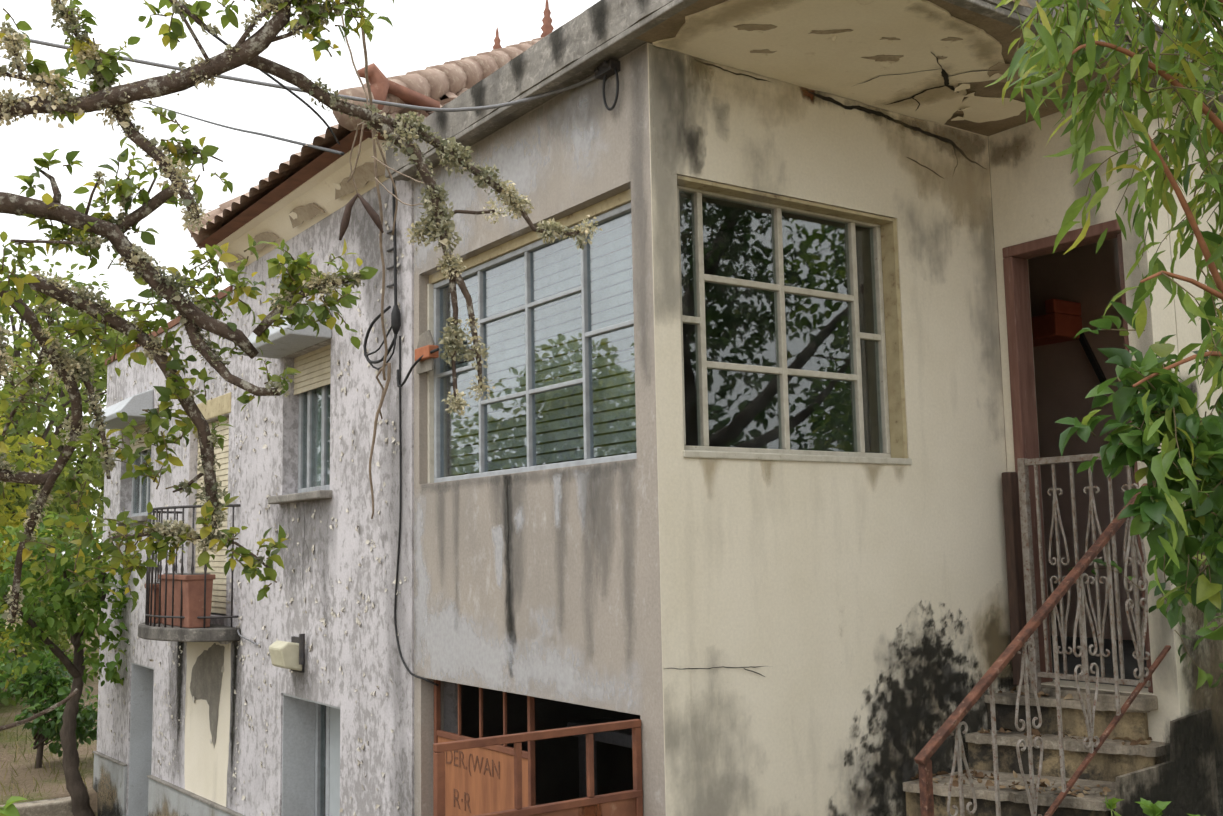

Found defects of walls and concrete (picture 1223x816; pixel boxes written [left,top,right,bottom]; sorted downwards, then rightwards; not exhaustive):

peeling [733,24,777,35]
peeling [808,29,853,41]
peeling [861,37,904,68]
crack [695,59,770,82]
damp [677,58,699,165]
crack [800,52,996,178]
peeling [99,334,374,807]
damp [414,474,614,696]
crack [665,666,773,677]